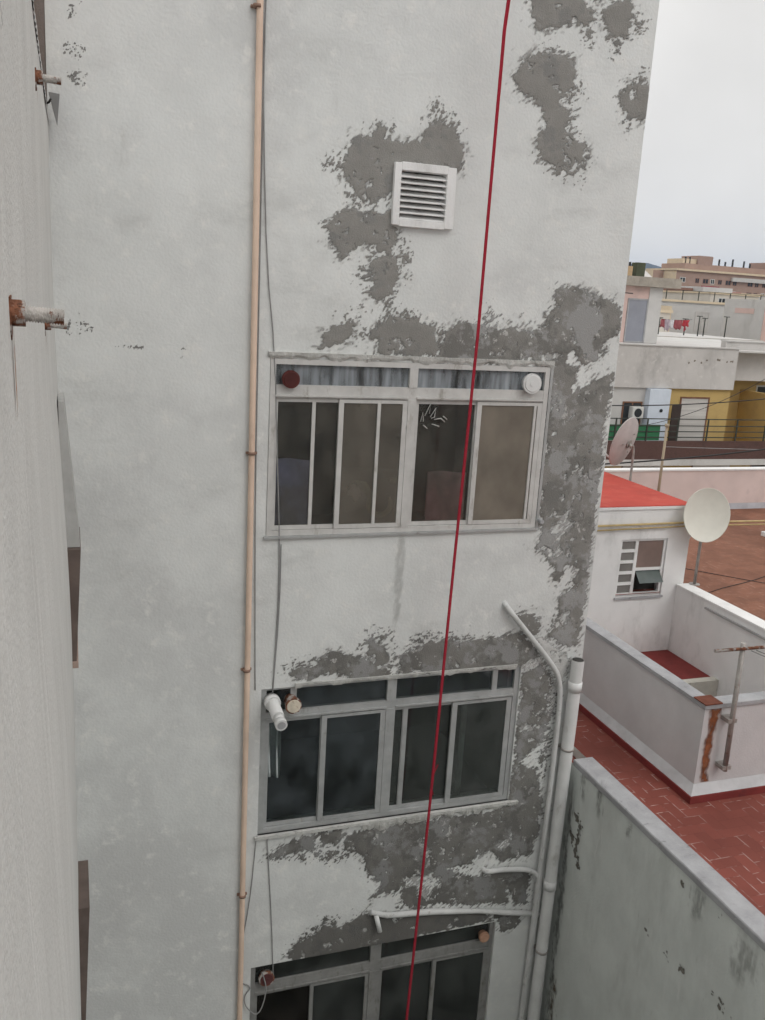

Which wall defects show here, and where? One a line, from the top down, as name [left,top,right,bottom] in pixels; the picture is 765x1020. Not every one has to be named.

peeling [508,664,557,815]
corrosion [701,708,722,782]
peeling [494,915,520,932]